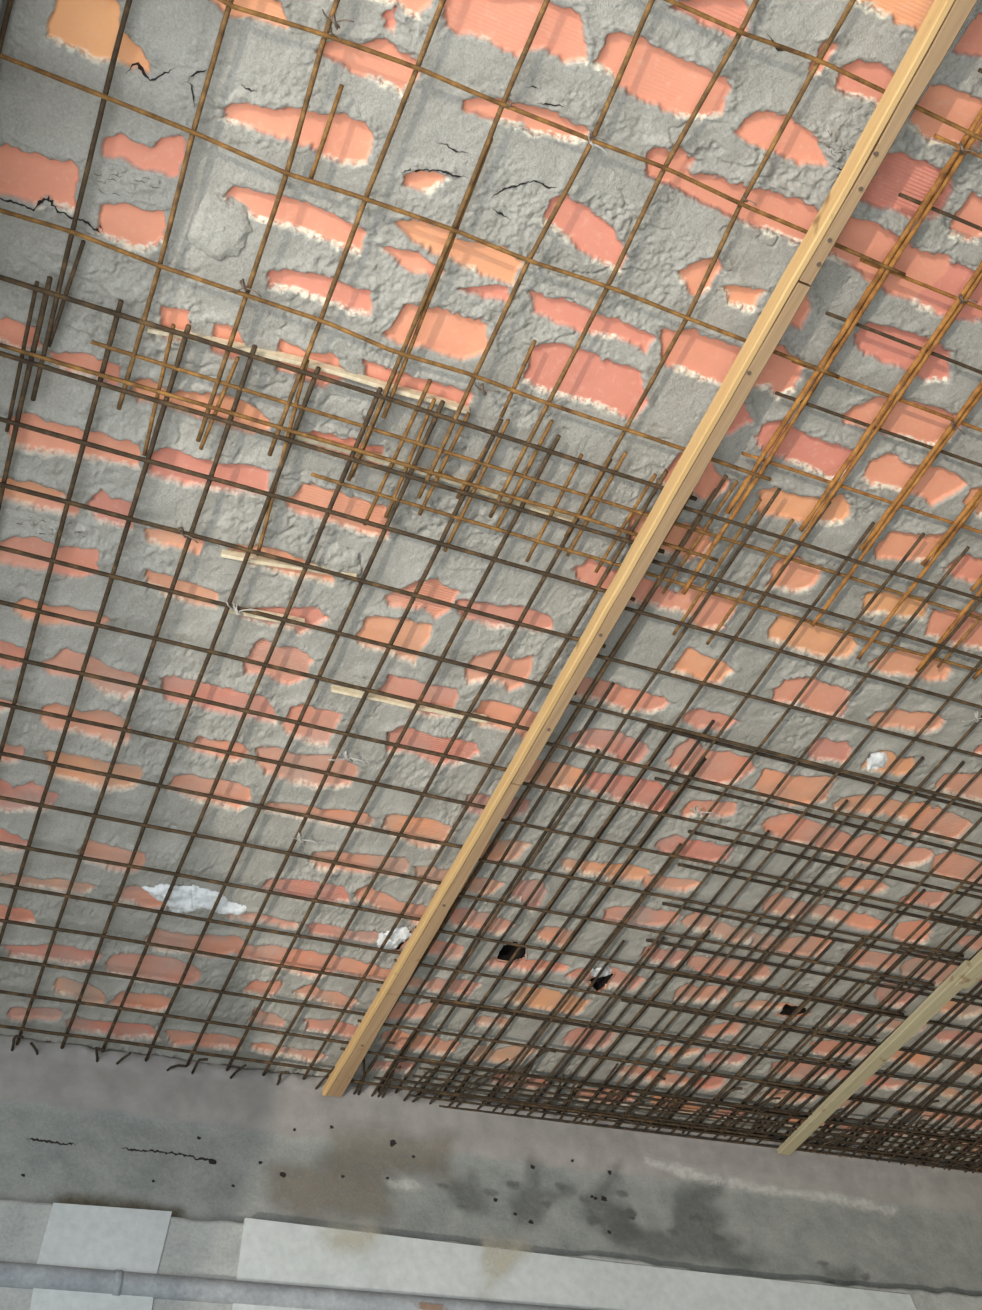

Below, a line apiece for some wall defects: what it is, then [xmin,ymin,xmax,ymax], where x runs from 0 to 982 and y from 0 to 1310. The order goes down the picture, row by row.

crack [127,62,206,107]
crack [0,196,103,232]
spalling [350,105,982,1173]
leakage [589,1157,896,1263]